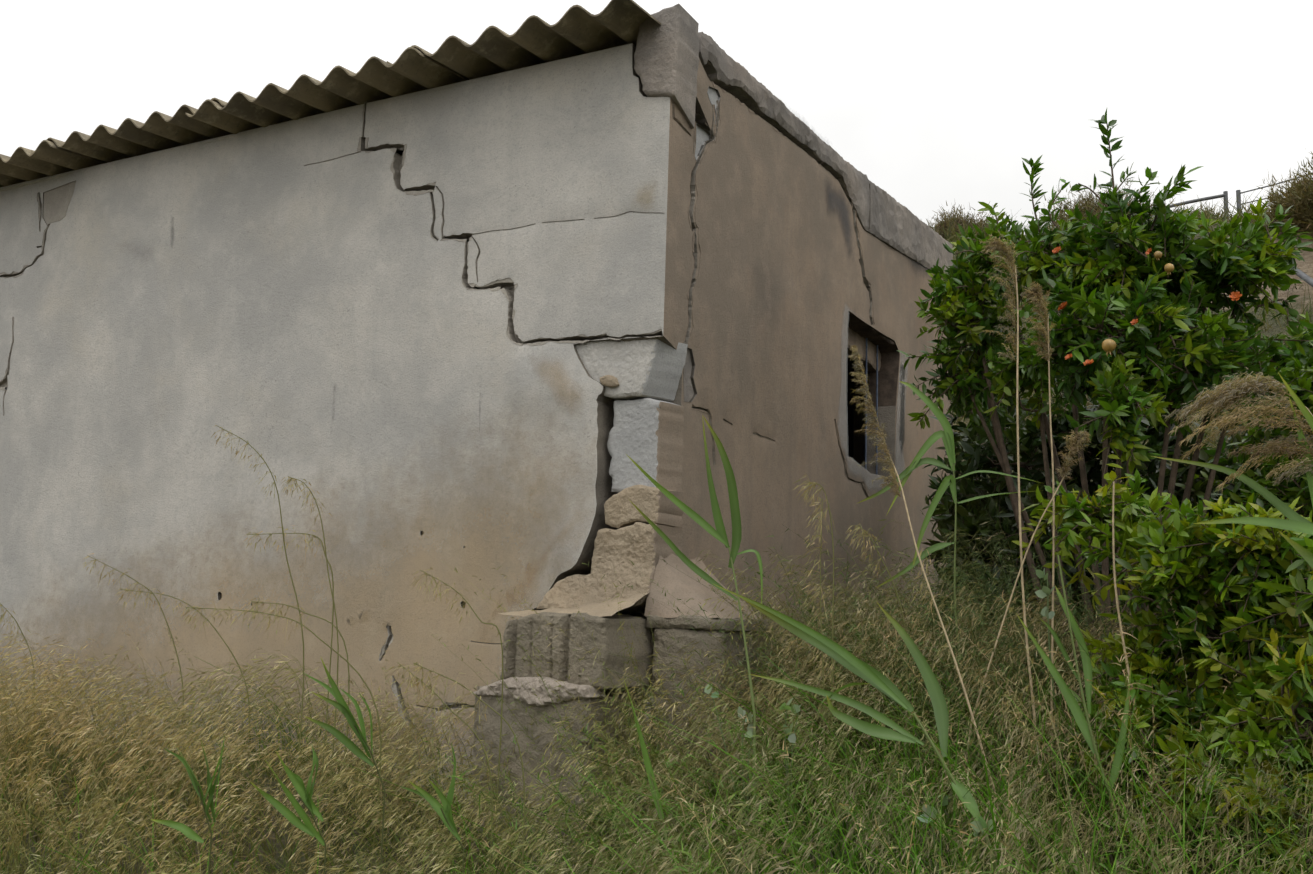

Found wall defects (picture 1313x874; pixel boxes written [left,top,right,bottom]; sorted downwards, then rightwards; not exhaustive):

crack [0,192,49,278]
crack [304,57,875,346]
crack [0,317,14,416]
spalling [683,347,697,402]